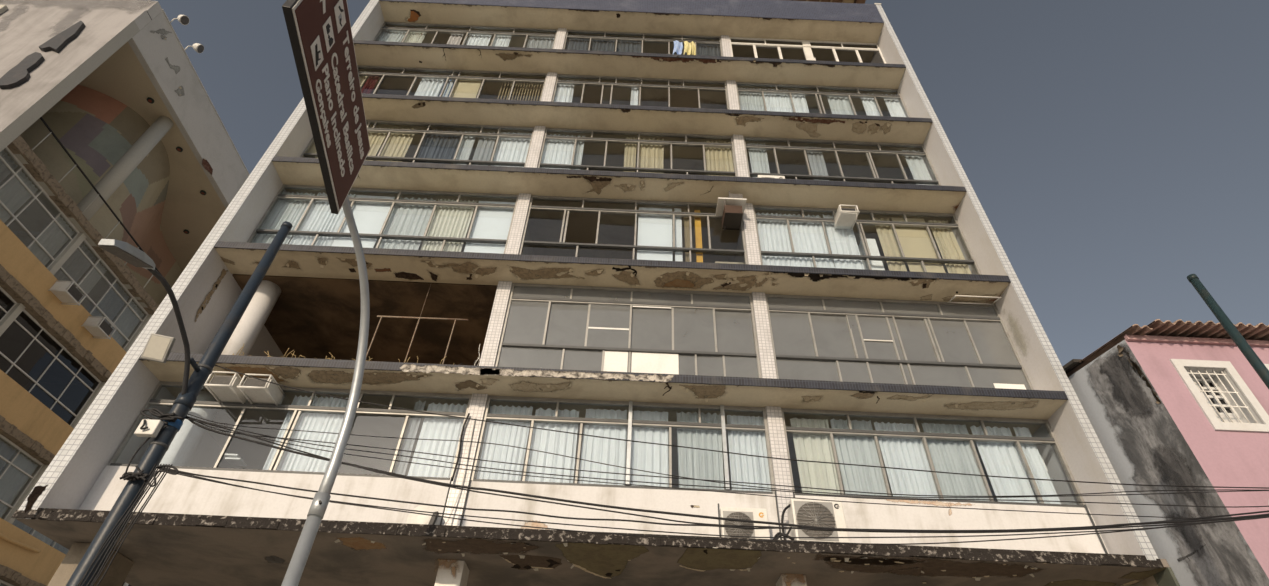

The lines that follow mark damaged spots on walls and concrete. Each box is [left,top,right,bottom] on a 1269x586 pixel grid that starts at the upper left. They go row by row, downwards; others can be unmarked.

peeling [726,114,764,127]
peeling [789,117,891,138]
spalling [567,176,645,194]
peeling [318,258,942,291]
peeling [225,366,427,385]
peeling [455,379,571,392]
leakage [1086,344,1269,586]
spalling [11,485,108,522]
spalling [126,515,1164,584]